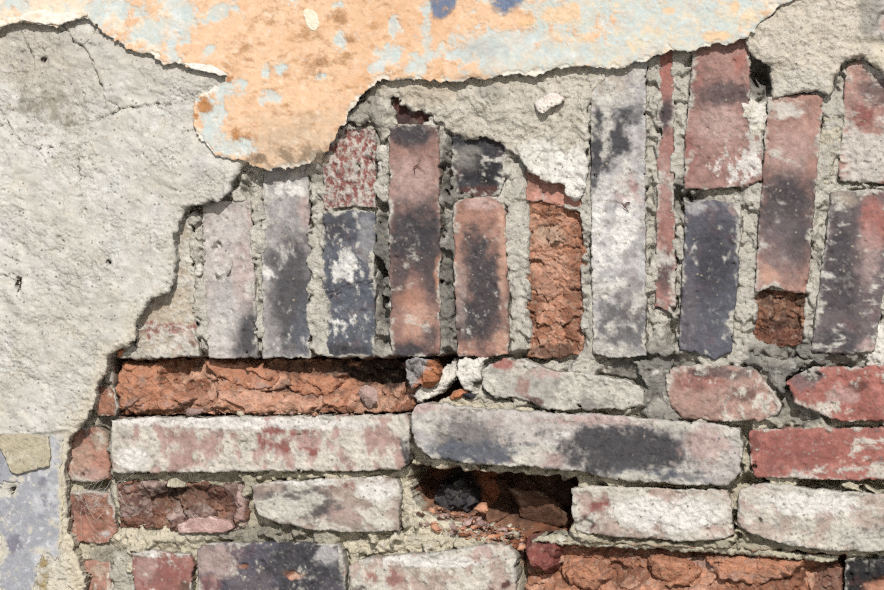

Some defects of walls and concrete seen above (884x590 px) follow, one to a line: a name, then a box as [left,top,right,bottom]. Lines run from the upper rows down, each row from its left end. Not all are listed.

peeling [0,8,88,27]
peeling [183,63,227,76]
spalling [534,93,565,114]
spalling [525,200,587,359]
spalling [753,288,808,348]
spalling [115,357,421,416]
peeling [0,433,65,590]
spalling [117,478,252,534]
spalling [524,533,845,590]